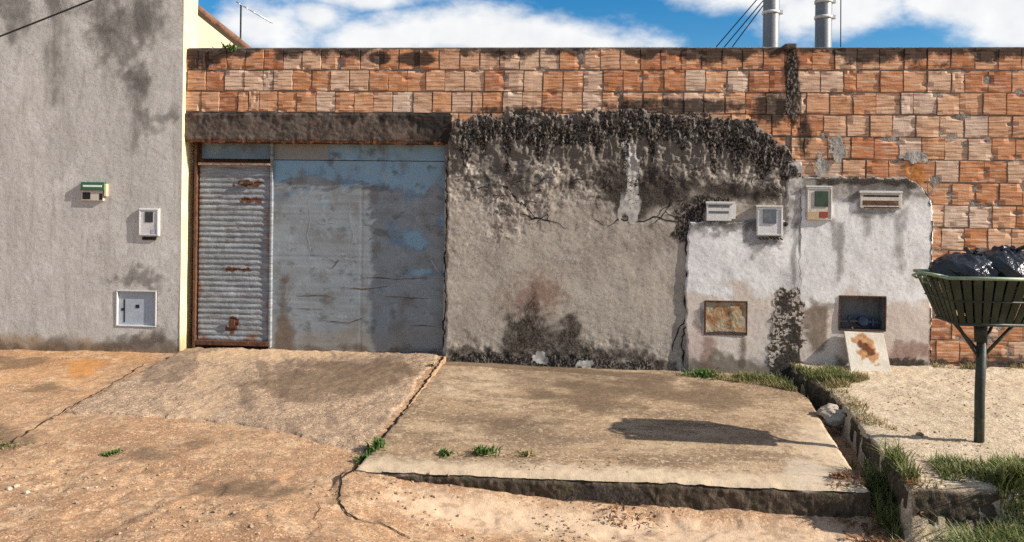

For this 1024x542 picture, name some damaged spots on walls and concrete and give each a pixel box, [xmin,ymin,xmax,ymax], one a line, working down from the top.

rust [233,179,267,203]
crack [477,151,731,367]
damp [446,295,677,371]
rust [852,333,879,365]
crack [0,364,144,449]